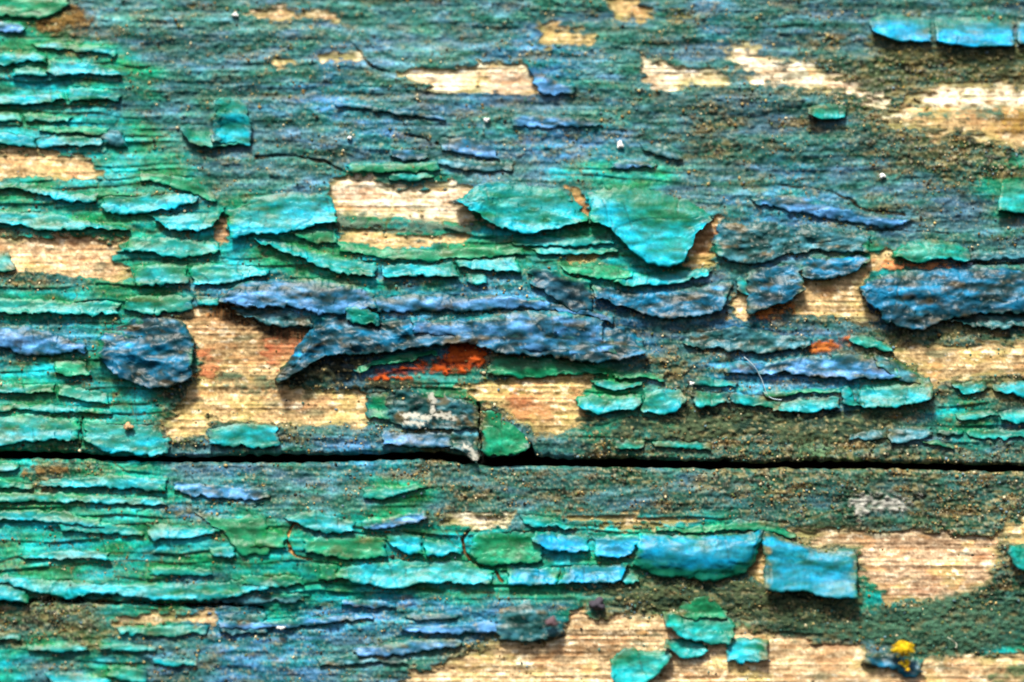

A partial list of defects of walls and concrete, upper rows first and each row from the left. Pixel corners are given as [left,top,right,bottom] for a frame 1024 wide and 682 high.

peeling [0,40,1024,463]
peeling [0,460,1024,682]